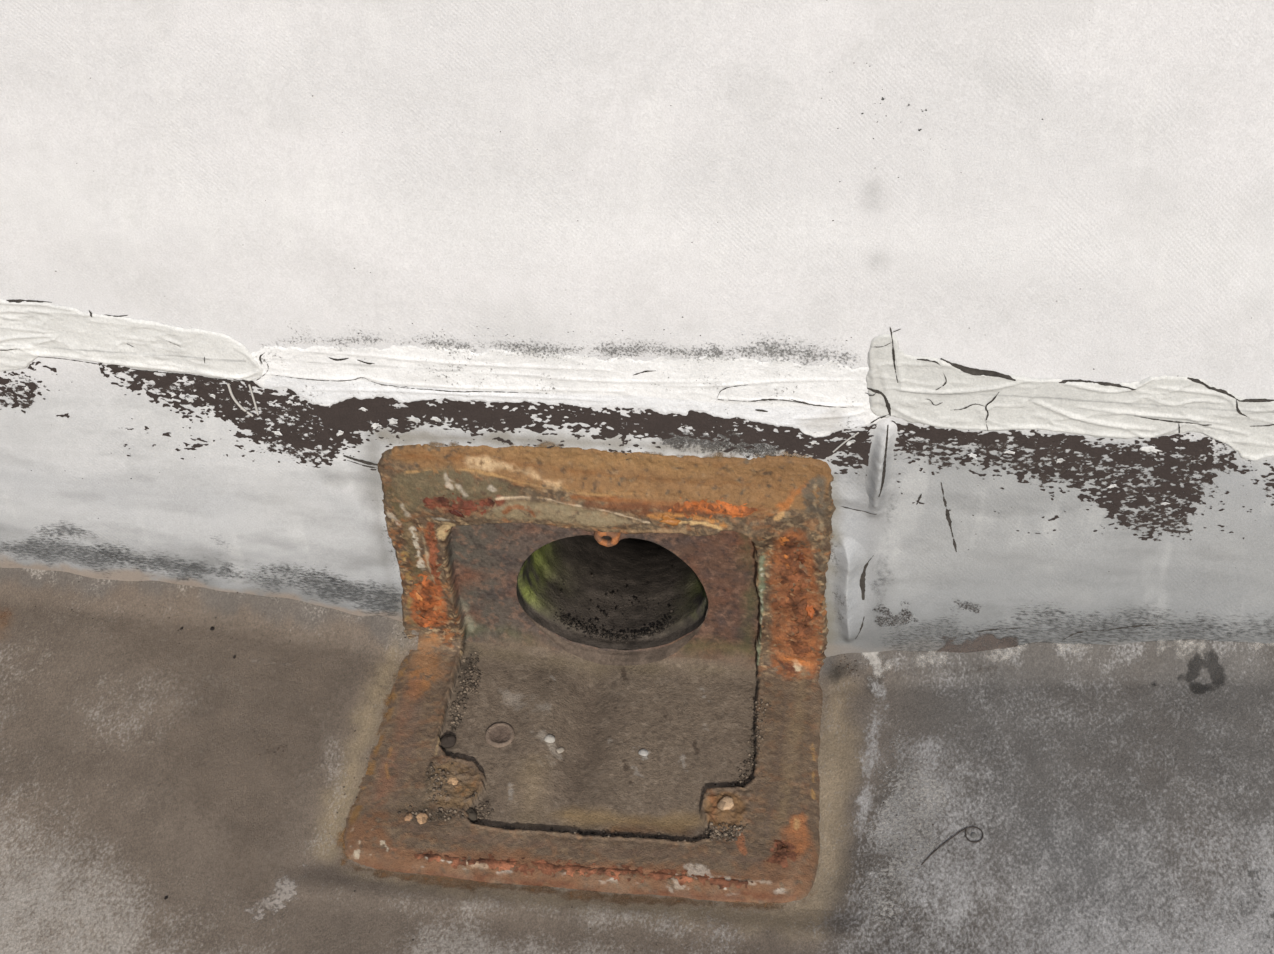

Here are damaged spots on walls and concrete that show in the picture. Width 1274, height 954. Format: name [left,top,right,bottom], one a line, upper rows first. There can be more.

peeling [0,361,57,413]
crack [43,311,528,393]
peeling [98,363,877,476]
crack [717,327,1016,515]
crack [1059,379,1209,433]
crack [1187,377,1274,427]
corrosion [423,493,495,518]
peeling [892,421,1274,541]
corrosion [409,523,446,629]
corrosion [771,534,823,658]
damp [1178,640,1225,694]
corrosion [338,829,776,908]